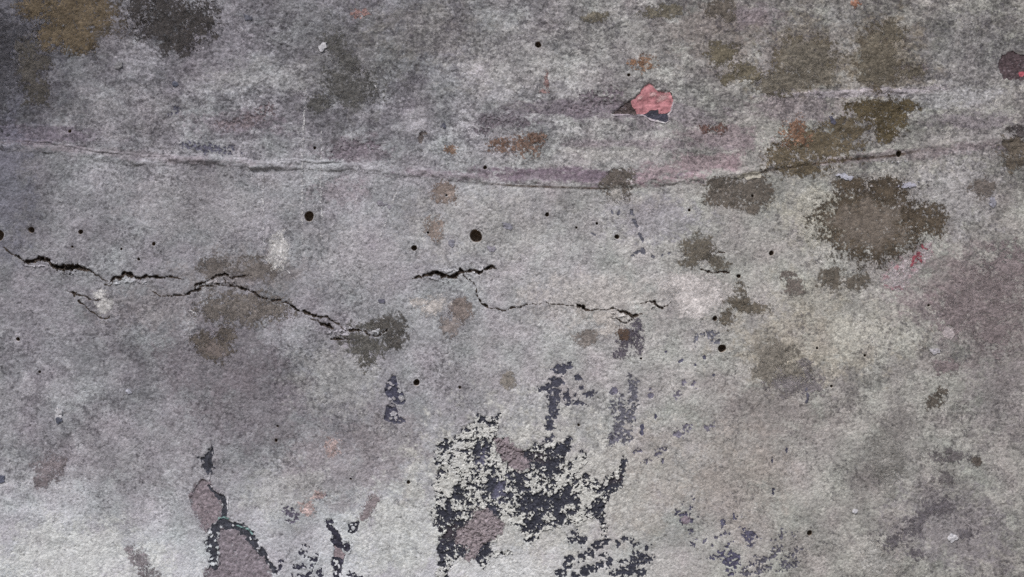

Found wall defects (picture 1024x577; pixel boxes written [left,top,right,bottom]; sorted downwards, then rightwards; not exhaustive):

peeling [559,82,675,124]
leakage [699,15,950,296]
crack [3,247,388,341]
crack [412,265,671,324]
peeling [384,374,406,424]
peeling [188,446,380,577]
peeling [430,361,715,577]